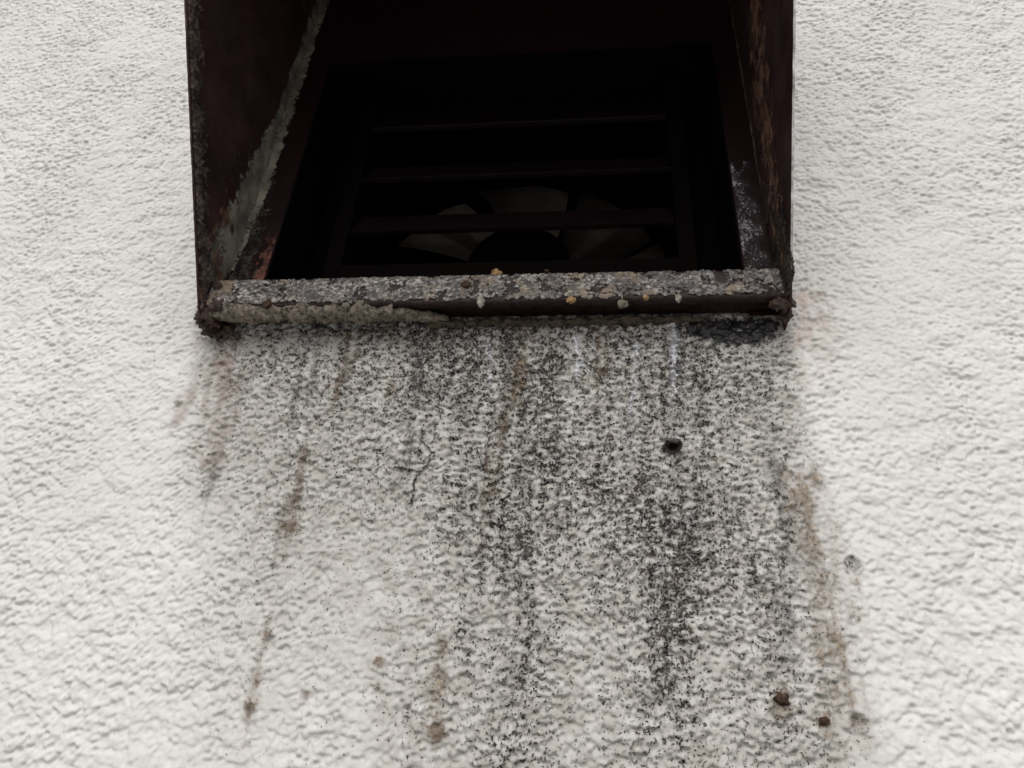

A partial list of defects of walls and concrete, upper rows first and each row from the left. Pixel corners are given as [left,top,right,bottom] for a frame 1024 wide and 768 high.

corrosion [198,0,786,305]
corrosion [244,612,274,729]
corrosion [274,447,307,564]
crack [394,441,432,509]
damp [187,312,868,768]
corrosion [773,464,861,716]